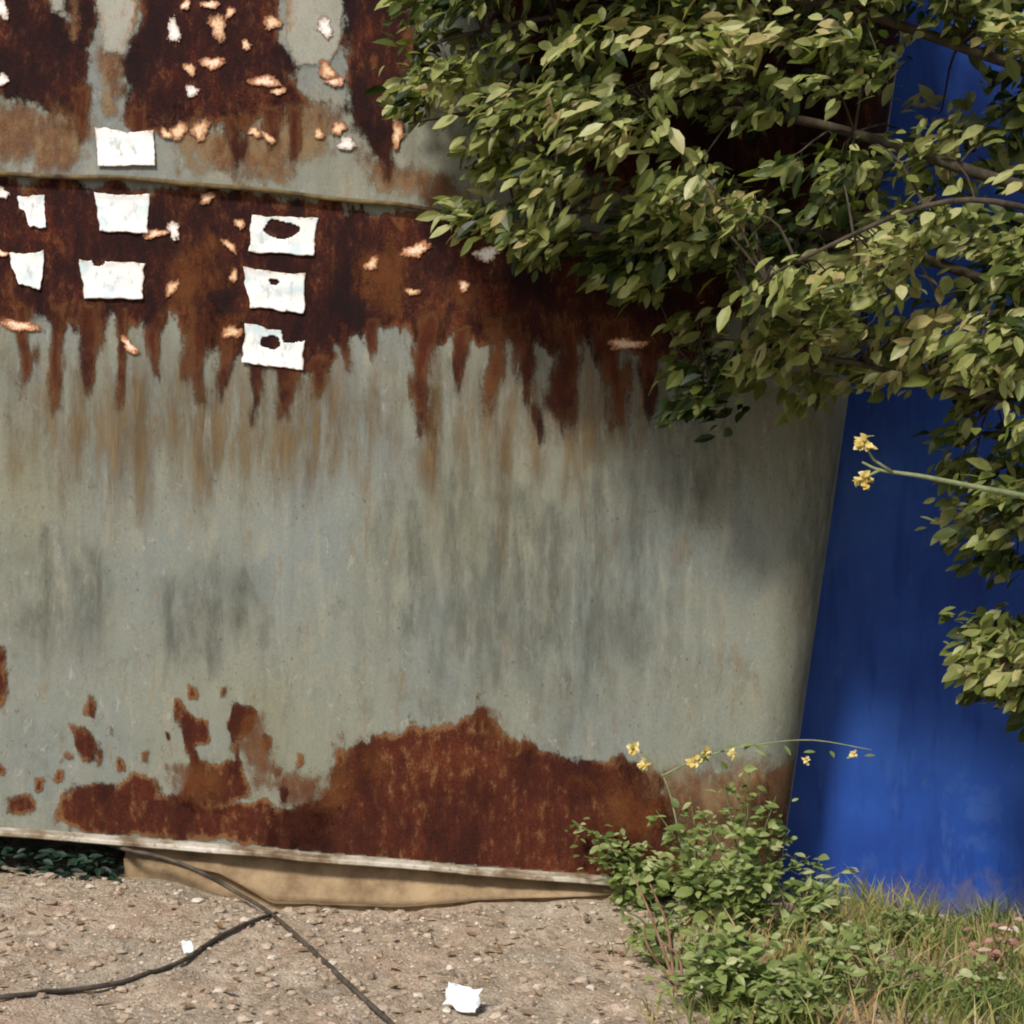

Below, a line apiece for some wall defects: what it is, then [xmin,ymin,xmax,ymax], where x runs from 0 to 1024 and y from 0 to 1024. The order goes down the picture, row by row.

peeling [286,0,345,87]
peeling [314,120,356,150]
corrosion [575,2,904,253]
corrosion [0,0,745,495]
corrosion [0,646,11,711]
corrosion [6,684,794,884]